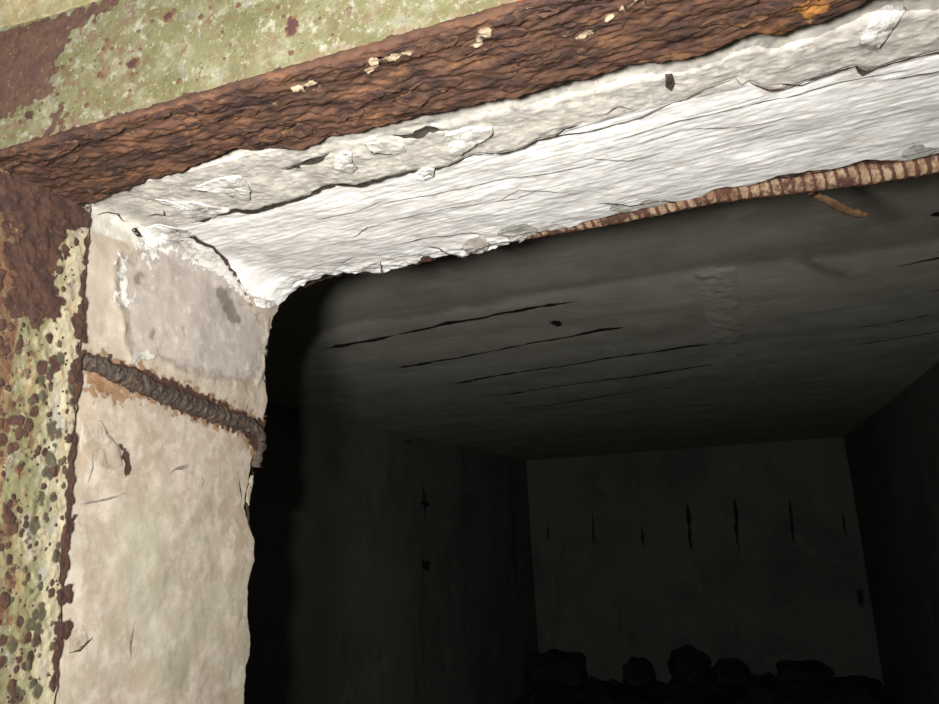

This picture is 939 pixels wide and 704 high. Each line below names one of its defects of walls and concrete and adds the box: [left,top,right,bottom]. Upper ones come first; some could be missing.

corrosion [265,5,303,55]
corrosion [299,0,625,92]
corrosion [699,0,836,28]
flaking render [860,4,906,49]
flaking render [665,73,674,91]
flaking render [445,126,493,156]
spalling [498,144,939,243]
corrosion [403,255,436,269]
corrosion [0,0,265,704]
crack [326,302,570,349]
crack [399,327,623,368]
crack [452,344,712,408]